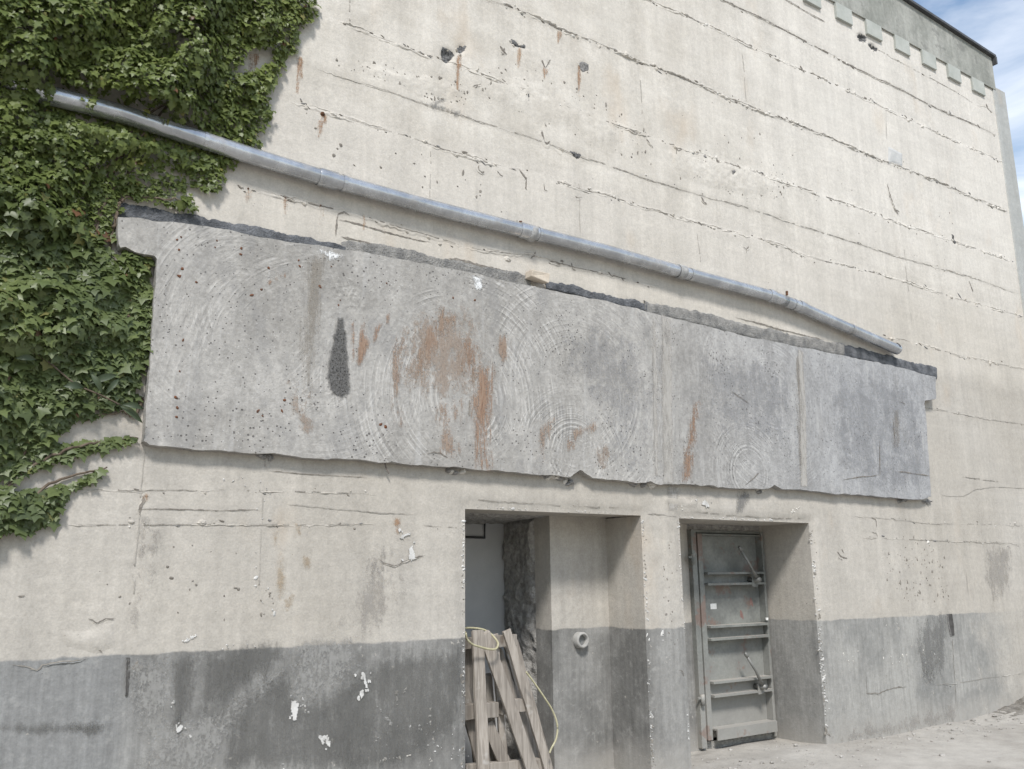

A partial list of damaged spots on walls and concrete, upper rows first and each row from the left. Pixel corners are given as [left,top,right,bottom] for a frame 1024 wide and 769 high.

spalling [441,45,466,63]
water stain [327,318,350,397]
corrosion [392,309,507,469]
corrosion [682,404,698,479]
water stain [230,658,460,769]
crack [865,673,907,695]